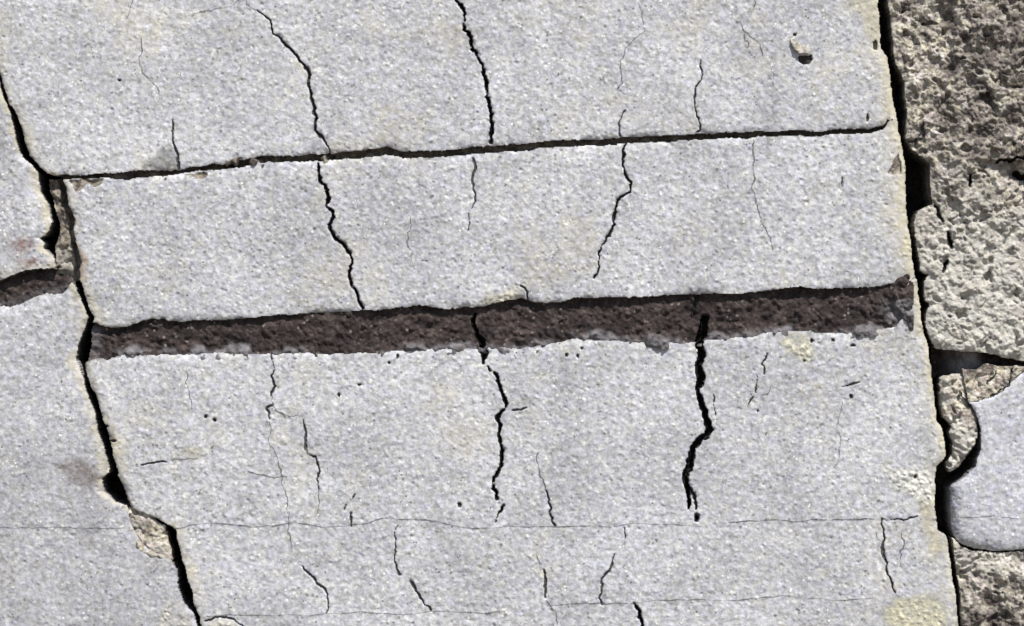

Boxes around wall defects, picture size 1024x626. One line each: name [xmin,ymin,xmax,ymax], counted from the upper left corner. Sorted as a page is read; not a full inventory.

crack [191,0,363,308]
crack [455,0,494,230]
crack [594,2,645,277]
peeling [791,33,813,65]
crack [908,123,925,143]
crack [934,206,953,272]
crack [996,156,1024,180]
crack [175,295,917,626]